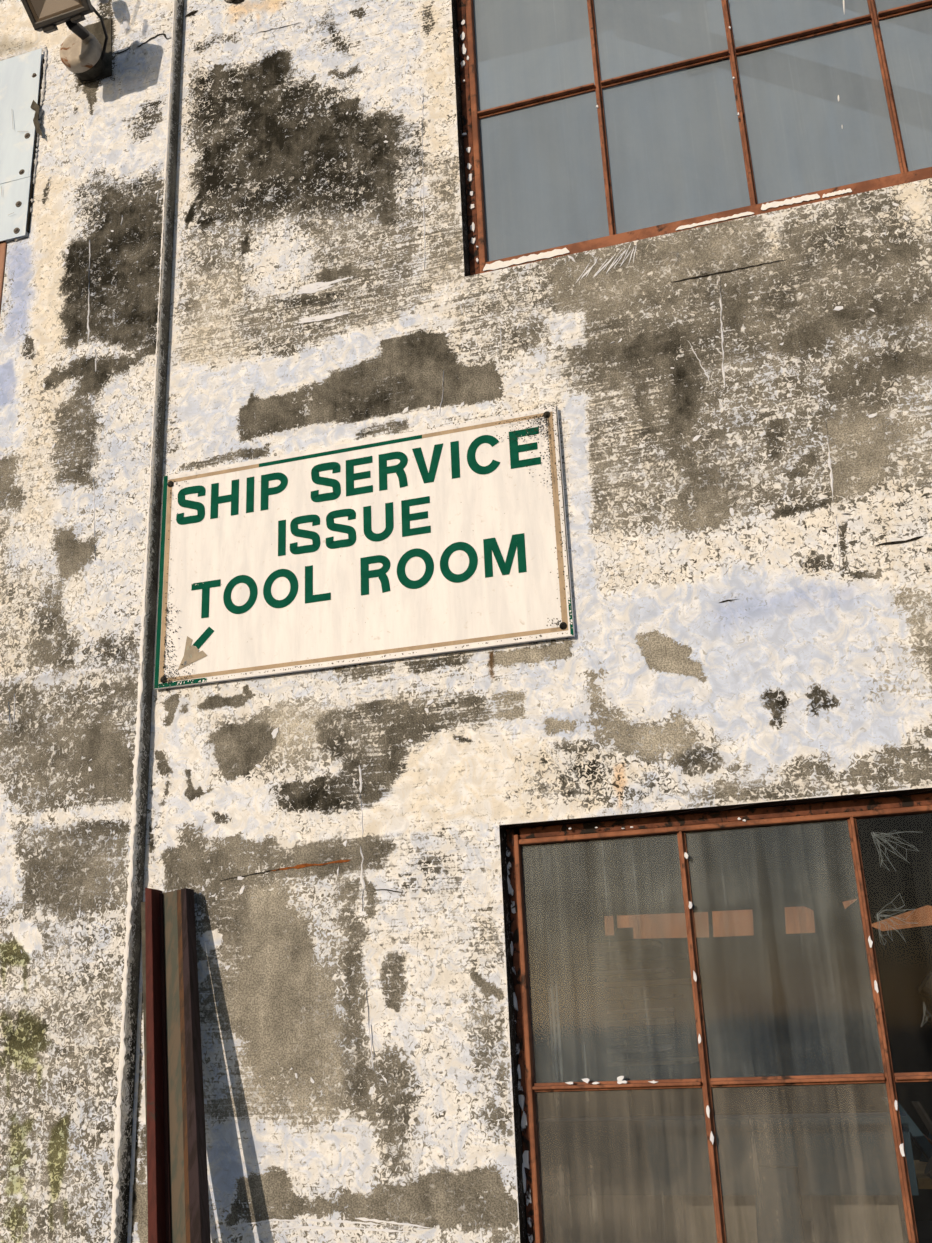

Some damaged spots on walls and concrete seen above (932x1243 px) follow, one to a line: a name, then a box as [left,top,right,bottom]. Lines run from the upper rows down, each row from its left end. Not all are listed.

peeling [303,2,370,82]
peeling [118,91,169,147]
peeling [182,30,436,232]
peeling [265,261,353,311]
damp [581,243,637,279]
peeling [0,157,166,517]
peeling [0,518,142,924]
peeling [148,278,932,1243]
corrosion [272,860,350,871]
damp [0,958,30,996]
damp [46,1197,70,1235]
damp [231,1217,430,1233]